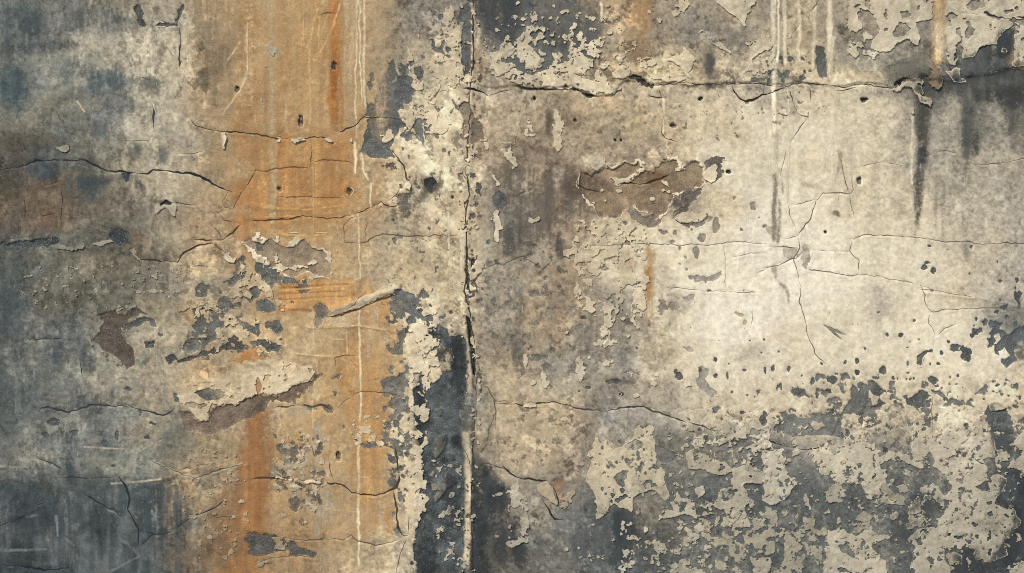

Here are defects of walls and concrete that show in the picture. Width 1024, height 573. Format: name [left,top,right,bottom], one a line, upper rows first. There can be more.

peeling [713,35,828,138]
crack [651,78,924,175]
peeling [846,0,1024,115]
corrosion [932,0,946,63]
damp [888,29,1024,217]
corrosion [212,0,400,573]
crack [0,0,709,573]
damp [415,386,426,465]
peeling [165,0,727,573]
damp [428,328,473,390]
peeling [586,277,1024,573]
crack [592,154,1024,363]